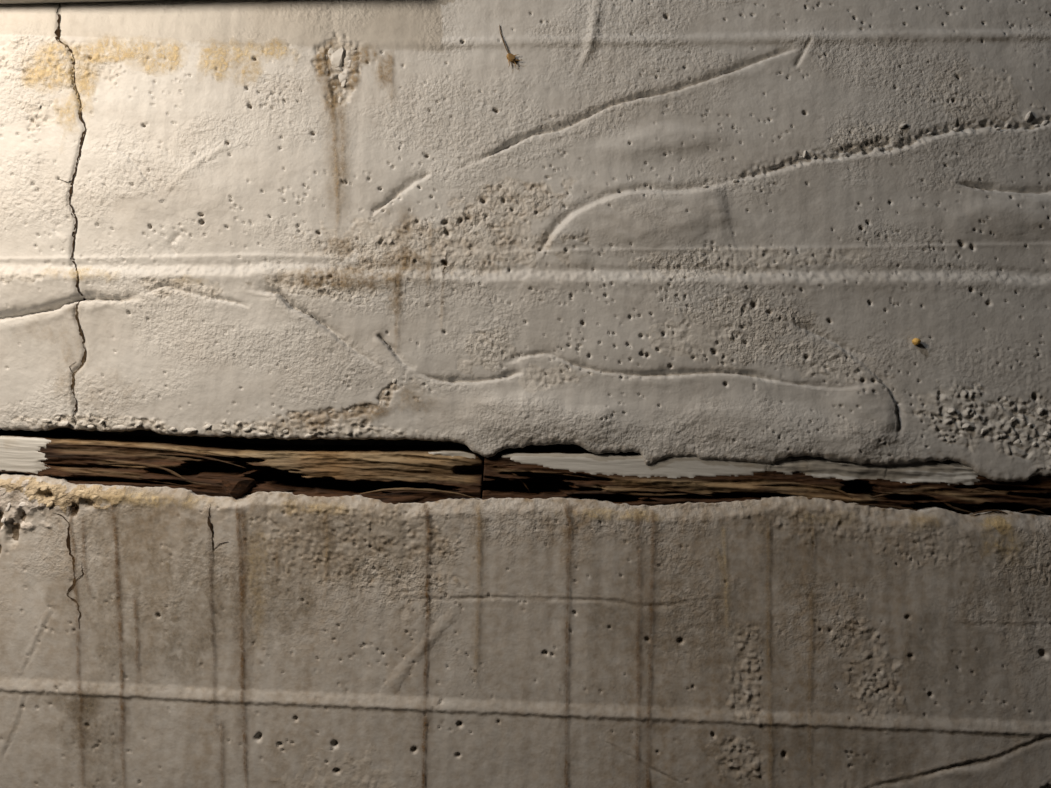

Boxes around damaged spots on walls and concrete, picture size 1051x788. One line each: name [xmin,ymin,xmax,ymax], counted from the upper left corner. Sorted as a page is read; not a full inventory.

water stain [29,39,179,121]
crack [54,3,86,424]
spalling [0,476,126,540]
peeling [767,458,980,485]
crack [55,513,84,621]